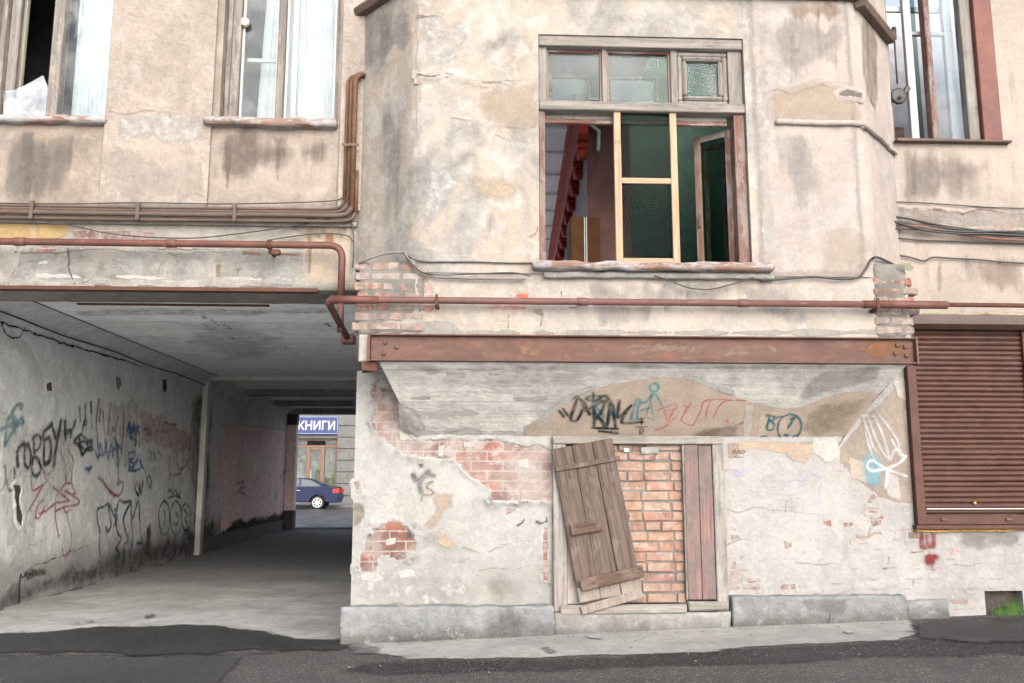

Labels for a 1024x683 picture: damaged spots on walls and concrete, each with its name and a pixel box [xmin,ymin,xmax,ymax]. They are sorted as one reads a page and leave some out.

leakage [8,135,69,193]
leakage [224,128,286,172]
leakage [908,157,969,196]
spalling [376,257,519,335]
spalling [533,328,877,337]
peeling [350,371,913,592]